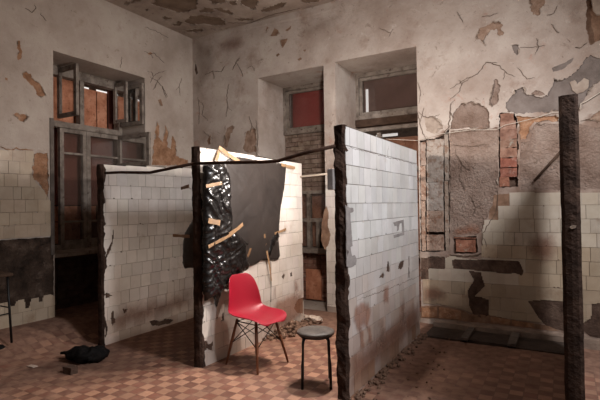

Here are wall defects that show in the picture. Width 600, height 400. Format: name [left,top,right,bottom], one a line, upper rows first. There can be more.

peeling [145,0,286,33]
peeling [266,26,291,57]
peeling [475,21,504,46]
spalling [586,0,600,45]
peeling [22,71,46,98]
crack [148,52,182,96]
peeling [243,128,257,153]
crack [418,62,532,215]
spalling [31,153,49,195]
spalling [152,122,212,368]
spalling [420,55,600,400]